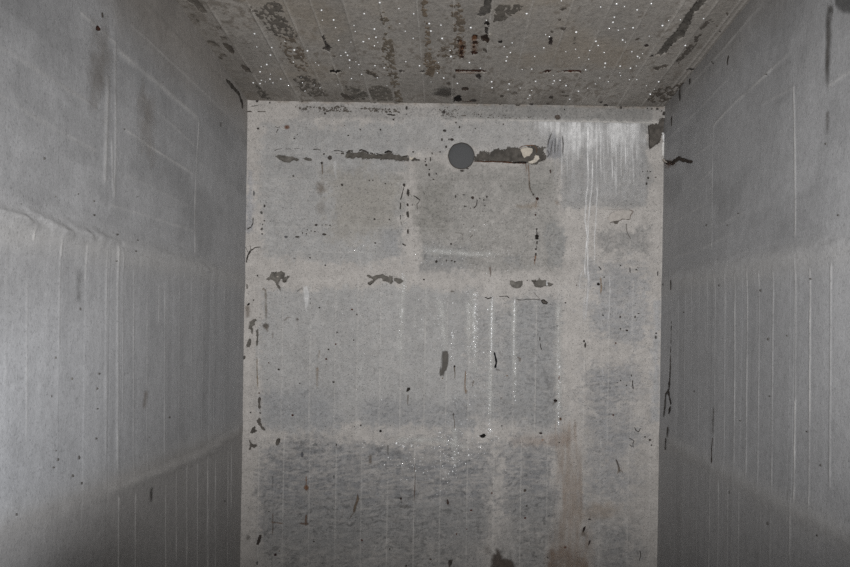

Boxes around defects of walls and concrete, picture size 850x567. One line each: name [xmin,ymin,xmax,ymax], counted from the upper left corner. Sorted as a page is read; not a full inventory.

peeling [249,0,329,102]
spalling [477,0,523,22]
spalling [650,0,714,70]
spalling [323,115,466,180]
spalling [460,145,548,172]
spalling [647,82,684,156]
damp [542,122,638,279]
spalling [257,271,290,291]
spalling [367,274,403,285]